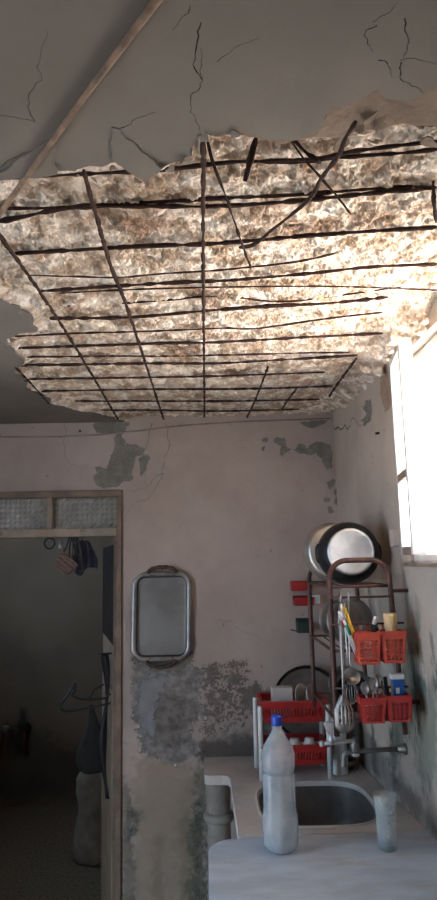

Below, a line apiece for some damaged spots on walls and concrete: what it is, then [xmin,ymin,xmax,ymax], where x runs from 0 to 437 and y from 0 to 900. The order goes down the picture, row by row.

crack [0,30,48,166]
crack [176,6,260,130]
crack [364,2,437,93]
corrosion [283,223,327,234]
corrosion [186,290,234,300]
spalling [0,111,437,489]
peeling [262,437,337,513]